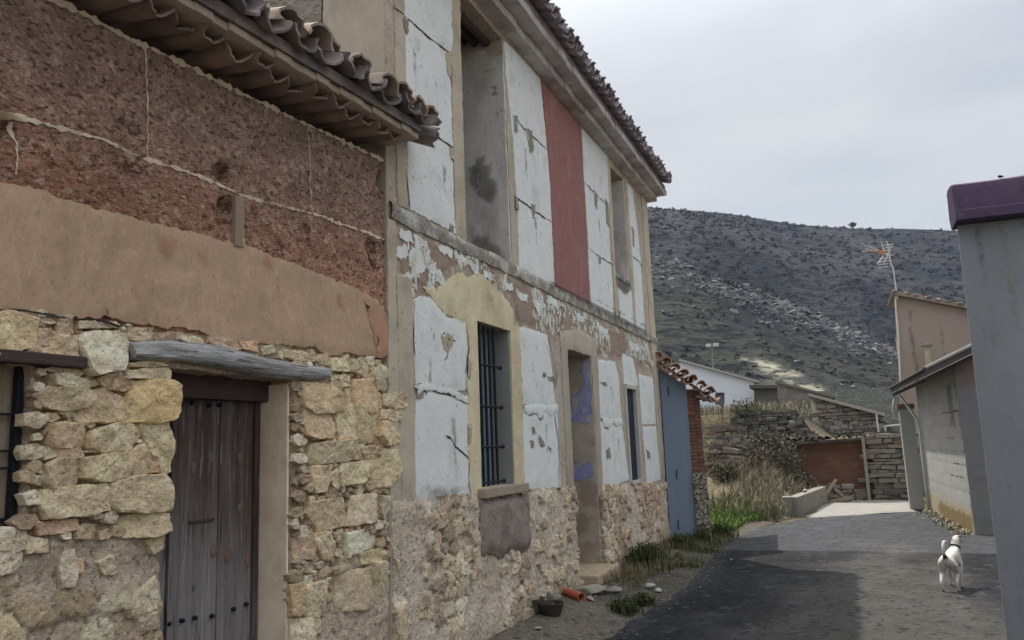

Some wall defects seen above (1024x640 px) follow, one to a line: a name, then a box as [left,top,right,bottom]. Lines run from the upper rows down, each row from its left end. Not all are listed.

peeling [363,223,654,429]
crack [446,435,471,494]